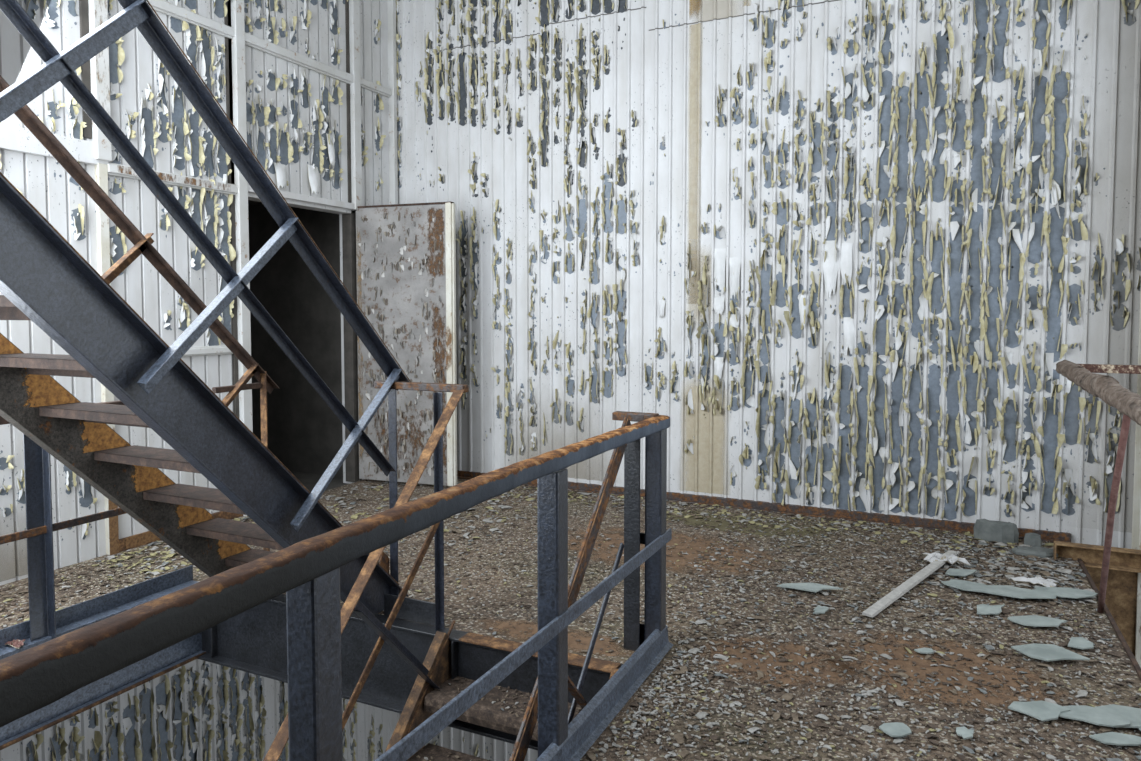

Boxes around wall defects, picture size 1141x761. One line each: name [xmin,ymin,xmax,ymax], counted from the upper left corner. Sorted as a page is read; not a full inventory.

peeling [169,0,228,103]
peeling [244,0,348,189]
peeling [125,58,236,264]
peeling [415,0,639,461]
peeling [644,0,1141,520]
corrosion [0,334,22,354]
corrosion [21,368,80,408]
corrosion [80,421,131,453]
corrosion [108,499,160,555]
corrosion [131,465,175,492]
corrosion [432,304,452,411]
peeling [26,661,289,761]